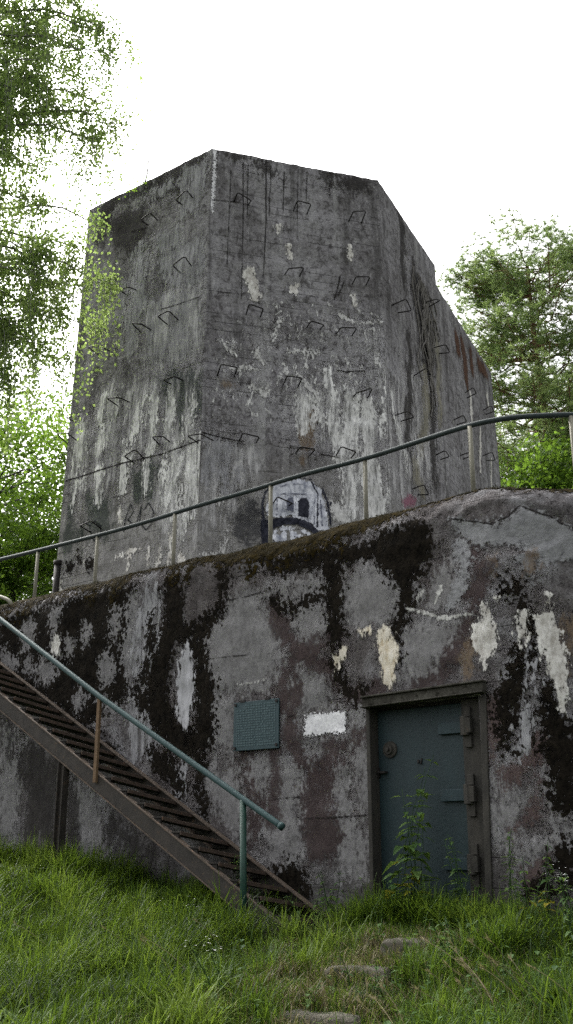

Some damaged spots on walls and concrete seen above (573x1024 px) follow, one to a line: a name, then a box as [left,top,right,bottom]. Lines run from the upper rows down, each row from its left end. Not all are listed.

damp [63,149,444,572]
rust [455,331,489,390]
crack [432,505,572,527]
spalling [412,504,573,716]
damp [49,634,61,657]
damp [124,581,196,802]
peeling [332,646,347,672]
peeling [357,624,399,690]
damp [487,642,549,836]